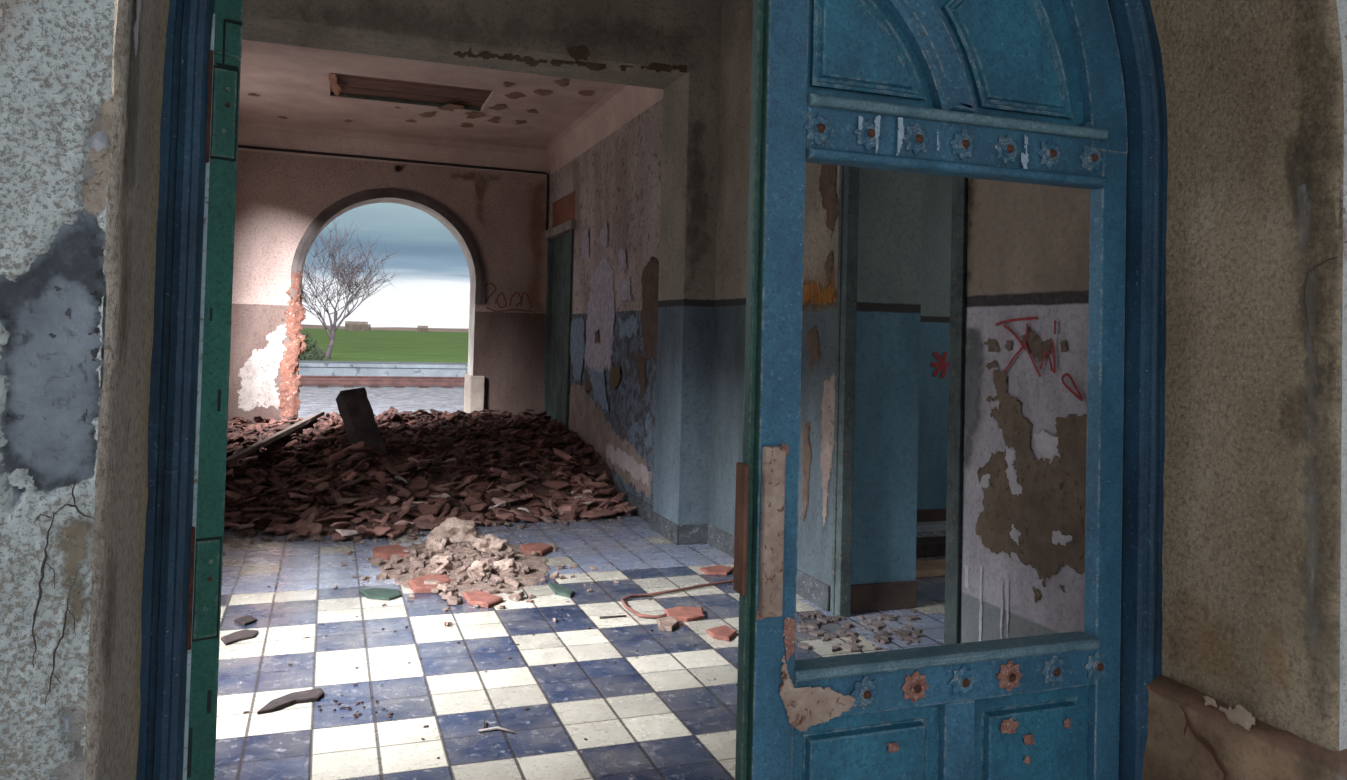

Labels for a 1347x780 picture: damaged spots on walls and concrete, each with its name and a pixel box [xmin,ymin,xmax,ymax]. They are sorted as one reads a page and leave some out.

peeling [126,0,144,201]
flaking render [0,209,111,505]
peeling [237,271,306,419]
peeling [568,222,659,498]
peeling [975,326,1087,603]
crack [32,479,94,706]
crack [1179,705,1227,780]
spalling [1203,696,1255,731]